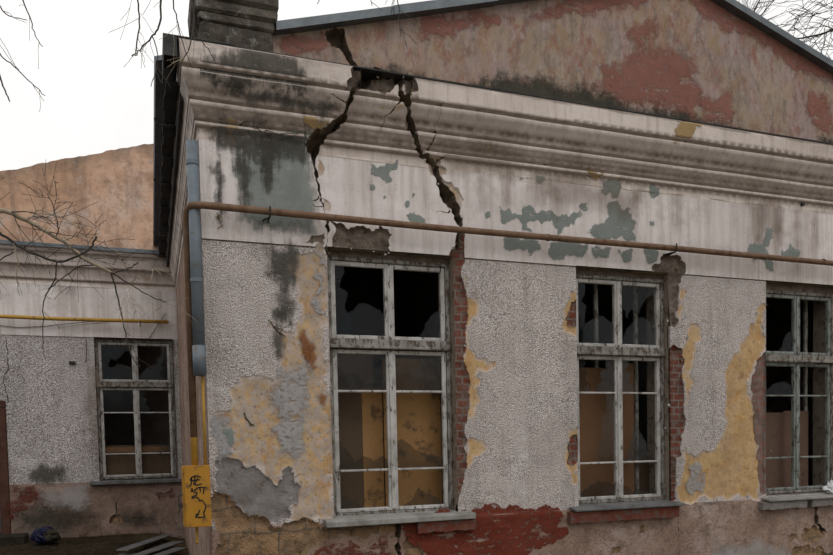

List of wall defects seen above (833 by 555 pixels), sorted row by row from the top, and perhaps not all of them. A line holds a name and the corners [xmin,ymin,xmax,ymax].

peeling [592,18,735,122]
peeling [690,0,833,79]
water stain [210,161,223,219]
water stain [215,119,312,205]
crack [265,28,463,255]
peeling [500,179,636,263]
water stain [266,243,299,357]
flaking render [643,249,686,328]
flaking render [211,136,580,555]
flaking render [664,303,772,505]
crack [393,523,401,555]
flaking render [789,524,833,555]